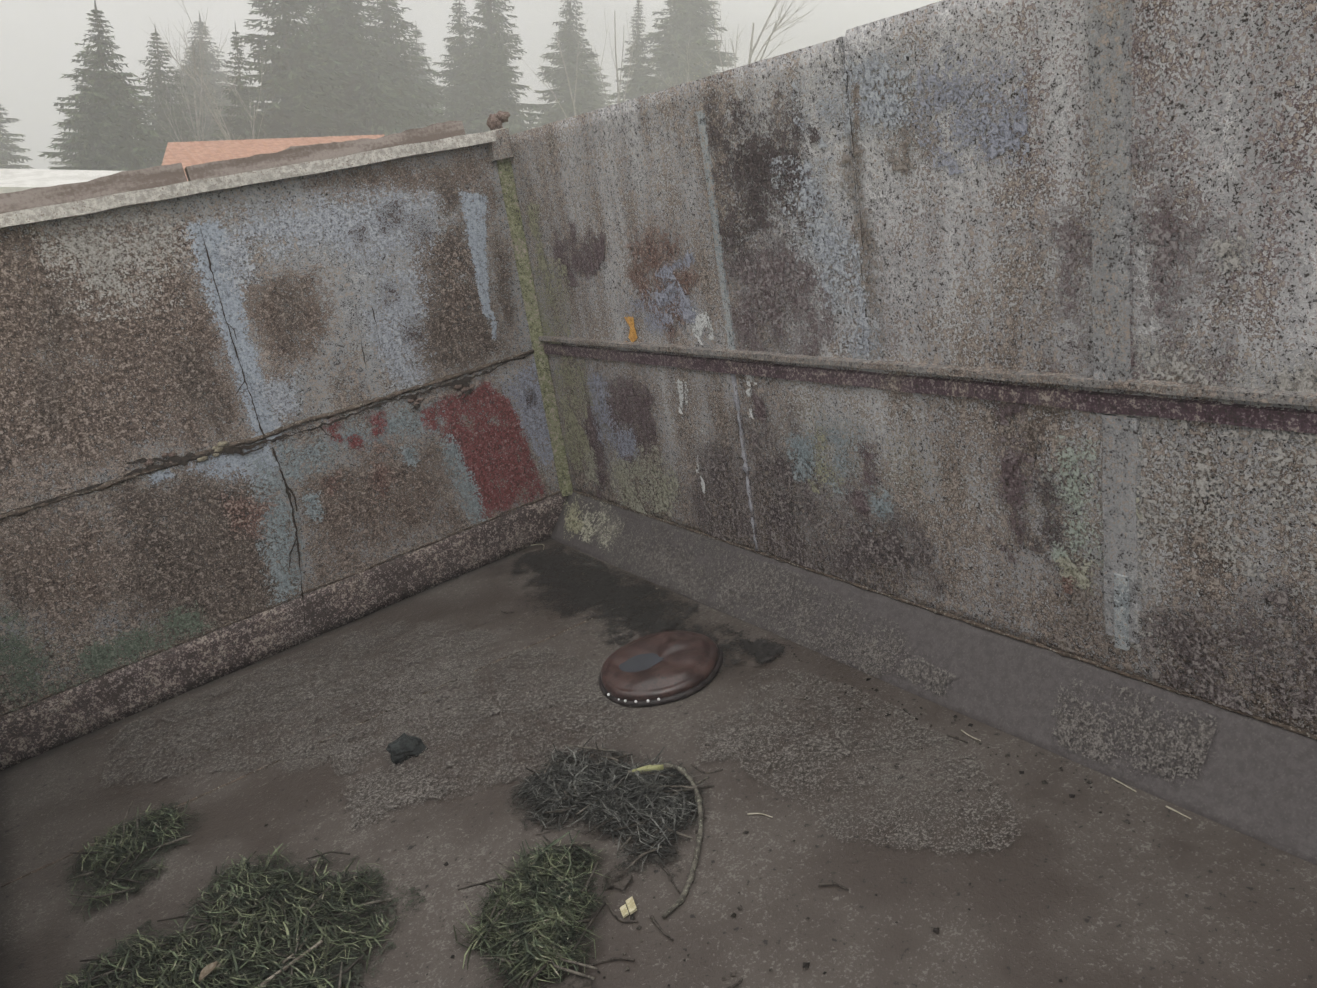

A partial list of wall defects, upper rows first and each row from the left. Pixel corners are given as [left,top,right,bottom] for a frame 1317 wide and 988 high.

crack [0,225,531,626]